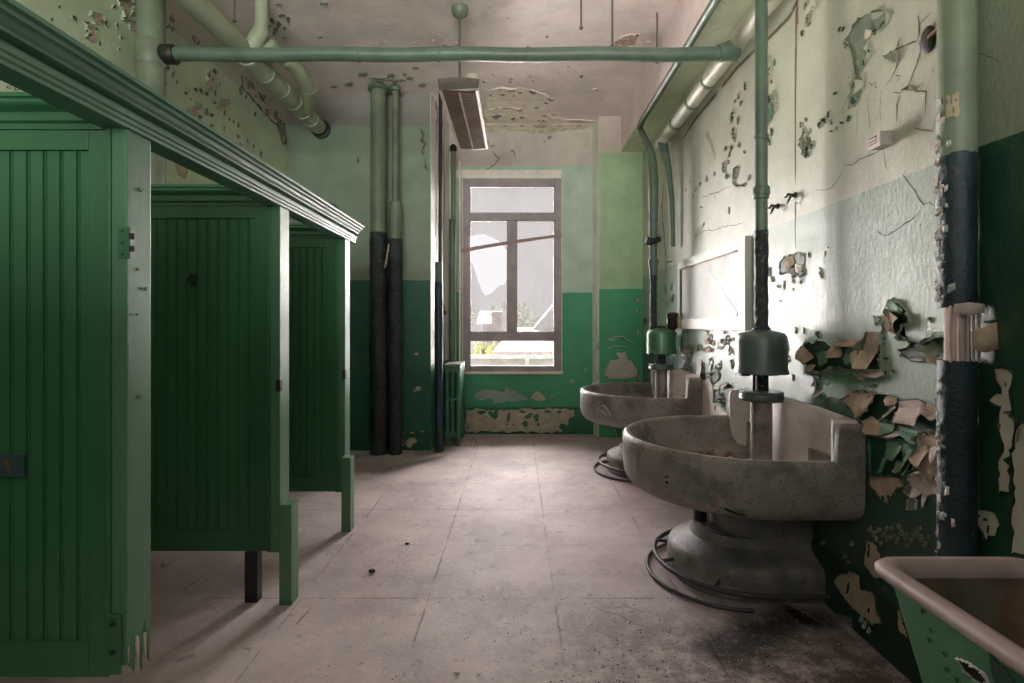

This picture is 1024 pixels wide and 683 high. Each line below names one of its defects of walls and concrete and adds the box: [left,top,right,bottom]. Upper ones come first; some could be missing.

peeling [166,65,287,158]
peeling [482,65,595,142]
peeling [685,81,751,208]
peeling [798,8,899,159]
crack [826,150,934,236]
crack [868,12,931,131]
peeling [768,252,811,302]
spalling [465,352,640,433]
peeling [788,297,944,511]
peeling [978,368,1024,555]
spalling [833,523,930,634]
spalling [927,627,1015,683]